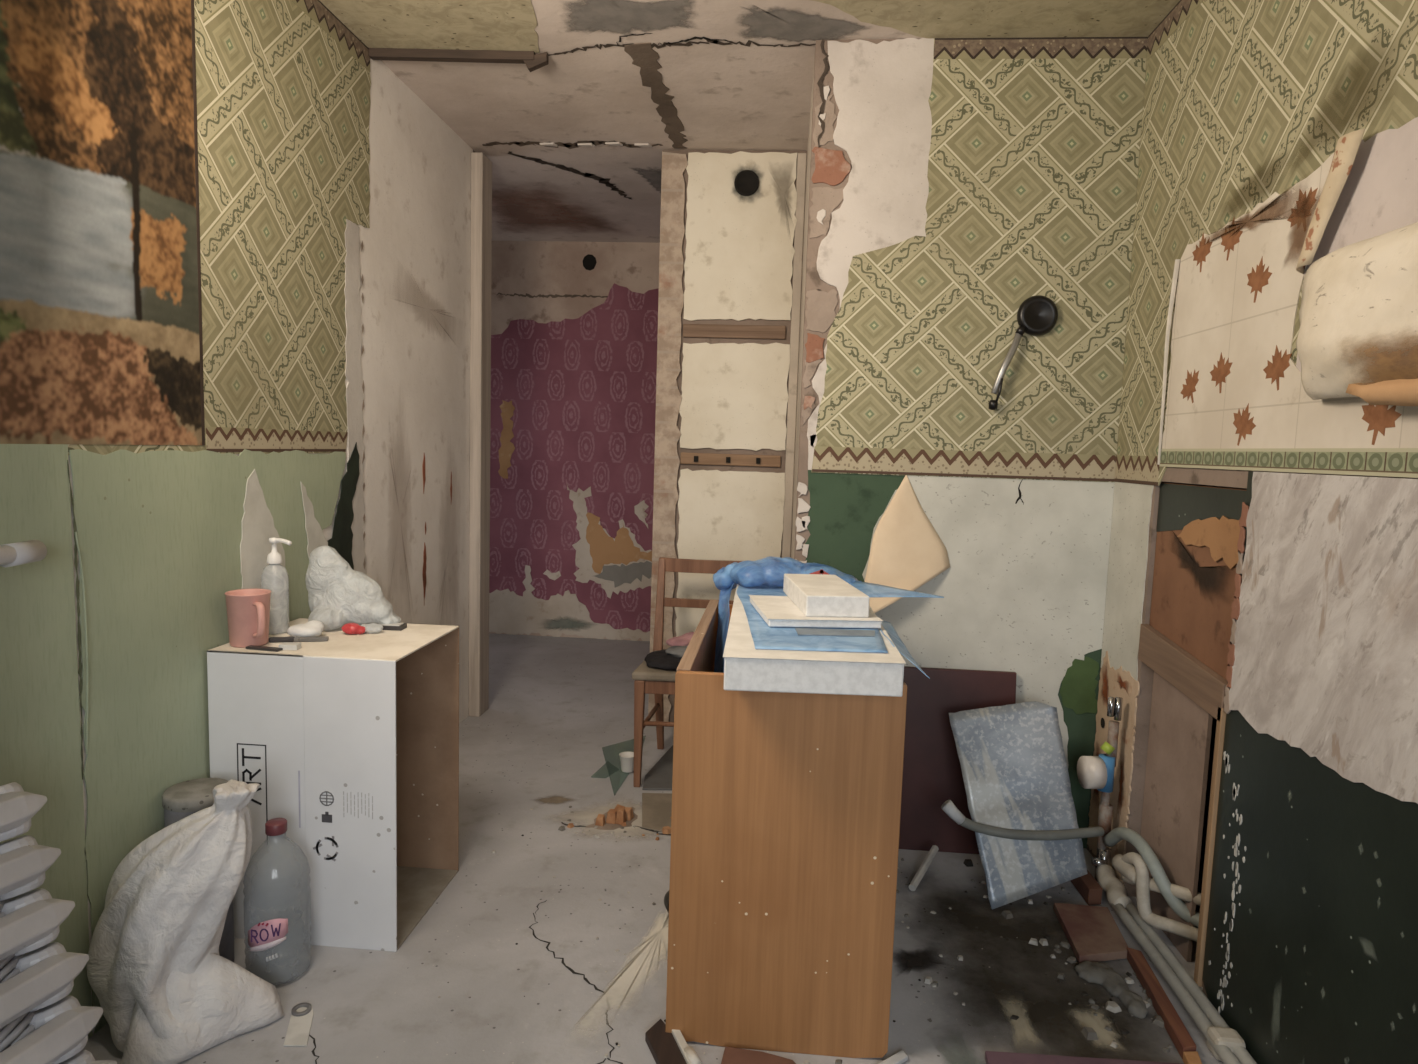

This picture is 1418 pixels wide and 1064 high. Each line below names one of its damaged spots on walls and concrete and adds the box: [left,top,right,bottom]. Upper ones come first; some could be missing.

flaking render [795,38,934,563]
flaking render [1304,117,1418,277]
crack [67,460,89,780]
peeling [1177,472,1418,804]
crack [529,900,623,1064]
peeling [1208,751,1247,1014]